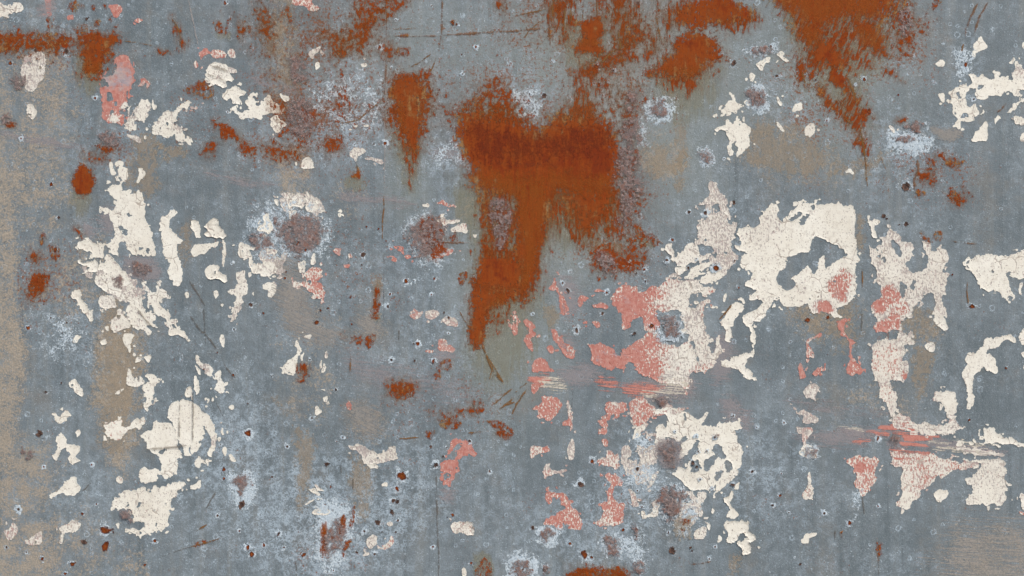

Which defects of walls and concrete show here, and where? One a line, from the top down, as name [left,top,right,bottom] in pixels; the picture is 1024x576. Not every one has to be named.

rust [0,0,131,91]
rust [71,130,123,198]
rust [144,14,189,56]
peeling [194,47,289,135]
rust [199,0,942,382]
peeling [713,92,755,161]
peeling [938,36,1024,142]
peeling [56,161,331,551]
peeling [508,181,1024,561]
peeling [429,433,477,487]